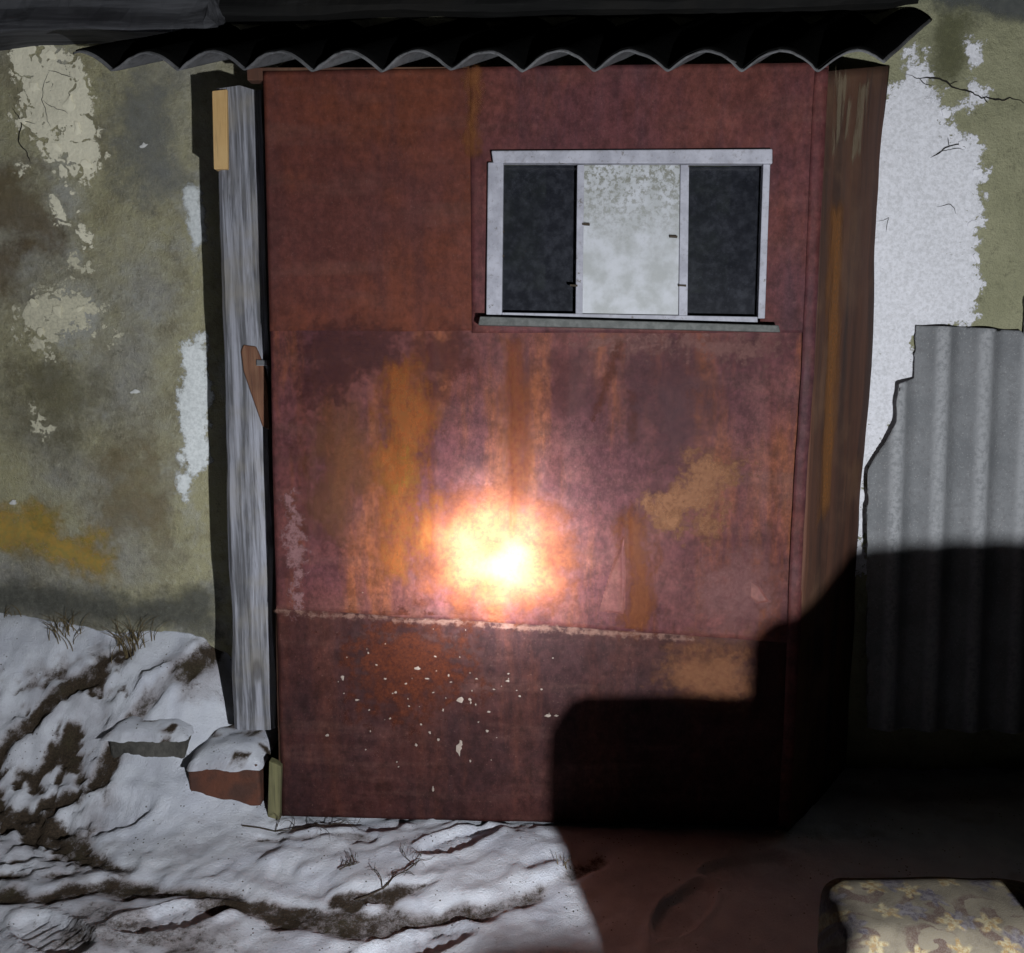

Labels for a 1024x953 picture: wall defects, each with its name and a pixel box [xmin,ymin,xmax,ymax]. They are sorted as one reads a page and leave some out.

crack [906,74,1023,103]
peeling [2,45,124,363]
corrosion [822,207,841,511]
peeling [855,35,994,577]
peeling [29,401,57,442]
peeling [175,473,192,502]
corrosion [337,609,483,725]